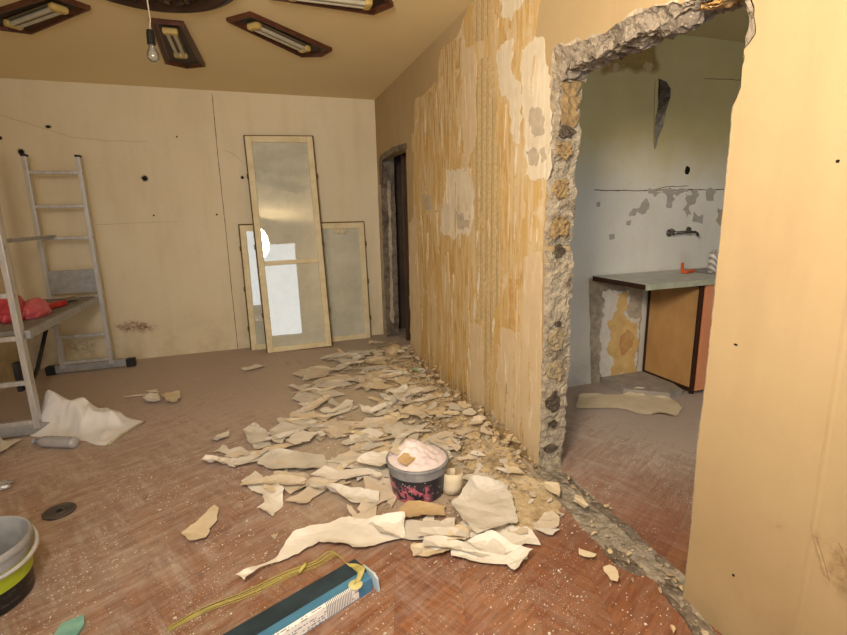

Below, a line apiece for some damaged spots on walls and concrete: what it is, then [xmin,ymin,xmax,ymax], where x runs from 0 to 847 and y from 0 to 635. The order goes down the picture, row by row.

flaking render [497,0,523,29]
flaking render [496,36,552,181]
flaking render [602,46,671,149]
flaking render [415,161,497,288]
peeling [626,187,722,226]
flaking render [589,278,643,383]